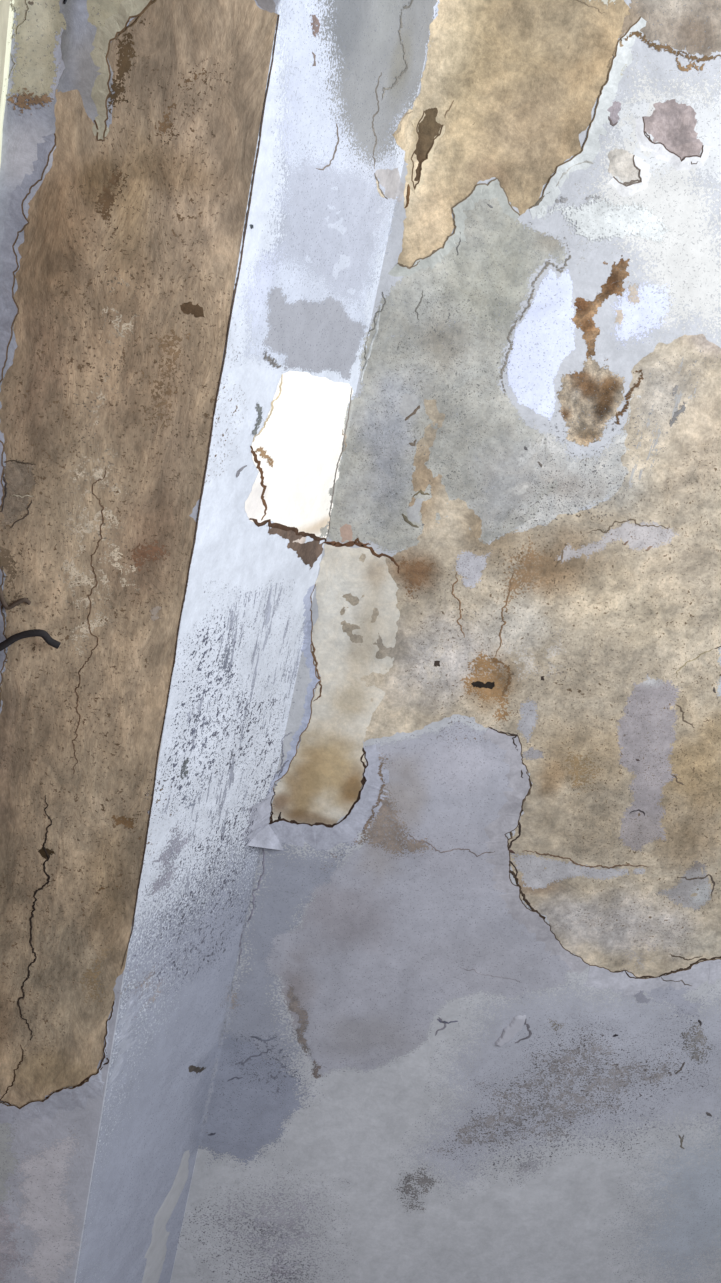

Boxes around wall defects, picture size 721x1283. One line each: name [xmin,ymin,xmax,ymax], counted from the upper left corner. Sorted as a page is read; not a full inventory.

peeling [310,14,320,66]
flaking render [388,0,713,278]
corrosion [556,255,644,447]
crack [72,471,106,772]
flaking render [0,0,280,1125]
flaking render [236,268,721,1003]
crack [0,795,55,1100]